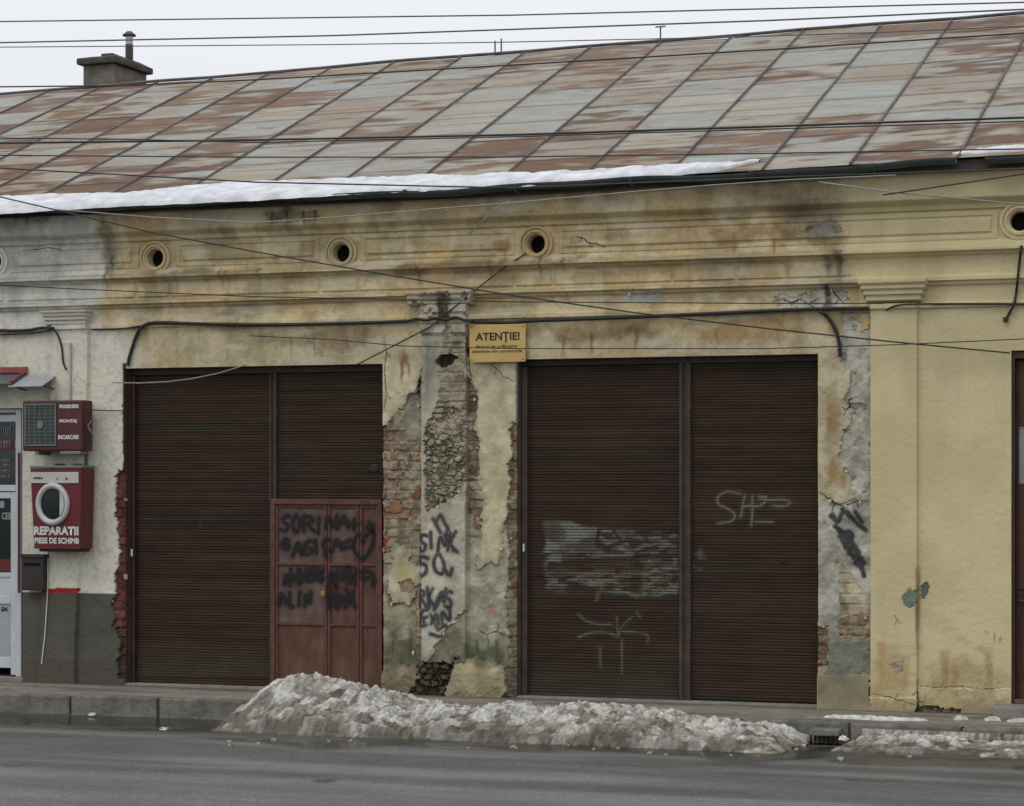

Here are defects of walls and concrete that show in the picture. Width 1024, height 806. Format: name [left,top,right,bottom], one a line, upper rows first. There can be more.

crack [773,285,844,307]
flaking render [111,469,127,678]
flaking render [382,334,517,698]
flaking render [775,285,872,666]
peeling [901,581,930,608]
crack [873,679,1002,711]